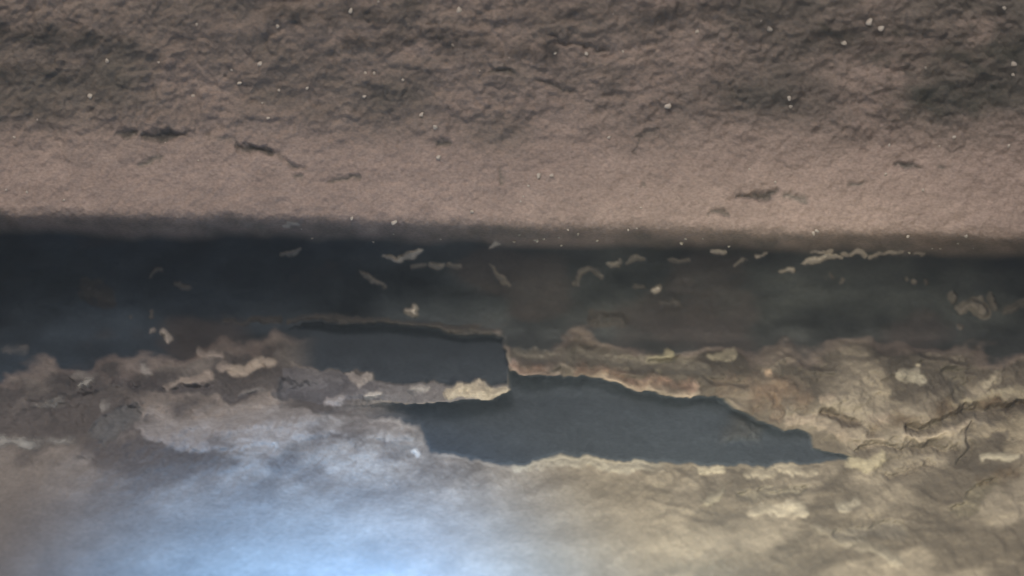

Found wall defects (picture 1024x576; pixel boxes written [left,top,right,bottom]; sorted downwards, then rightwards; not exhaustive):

spalling [0,323,1024,576]
crack [855,400,1024,482]